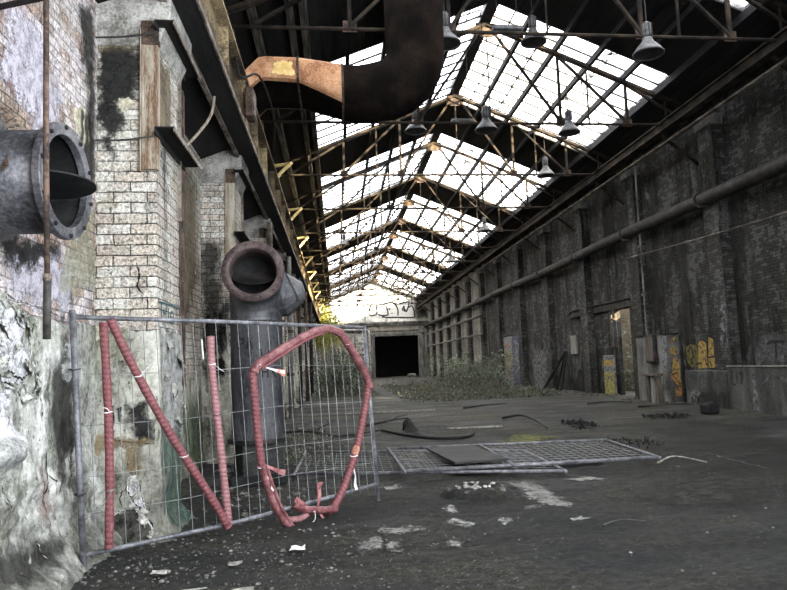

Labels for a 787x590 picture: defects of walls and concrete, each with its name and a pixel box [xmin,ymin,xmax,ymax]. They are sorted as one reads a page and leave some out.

damp [80,7,118,182]
peeling [0,289,44,406]
damp [52,354,75,478]
peeling [104,472,154,545]